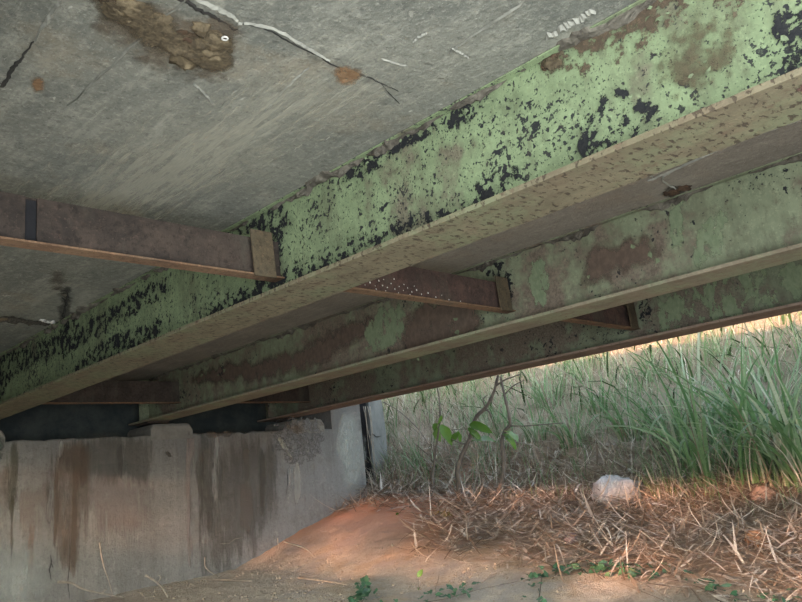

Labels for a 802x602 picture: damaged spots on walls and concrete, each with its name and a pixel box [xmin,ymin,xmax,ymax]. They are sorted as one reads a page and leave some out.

crack [0,0,64,88]
crack [177,0,340,68]
peeling [771,3,802,70]
crack [360,74,400,104]
water stain [8,444,18,551]